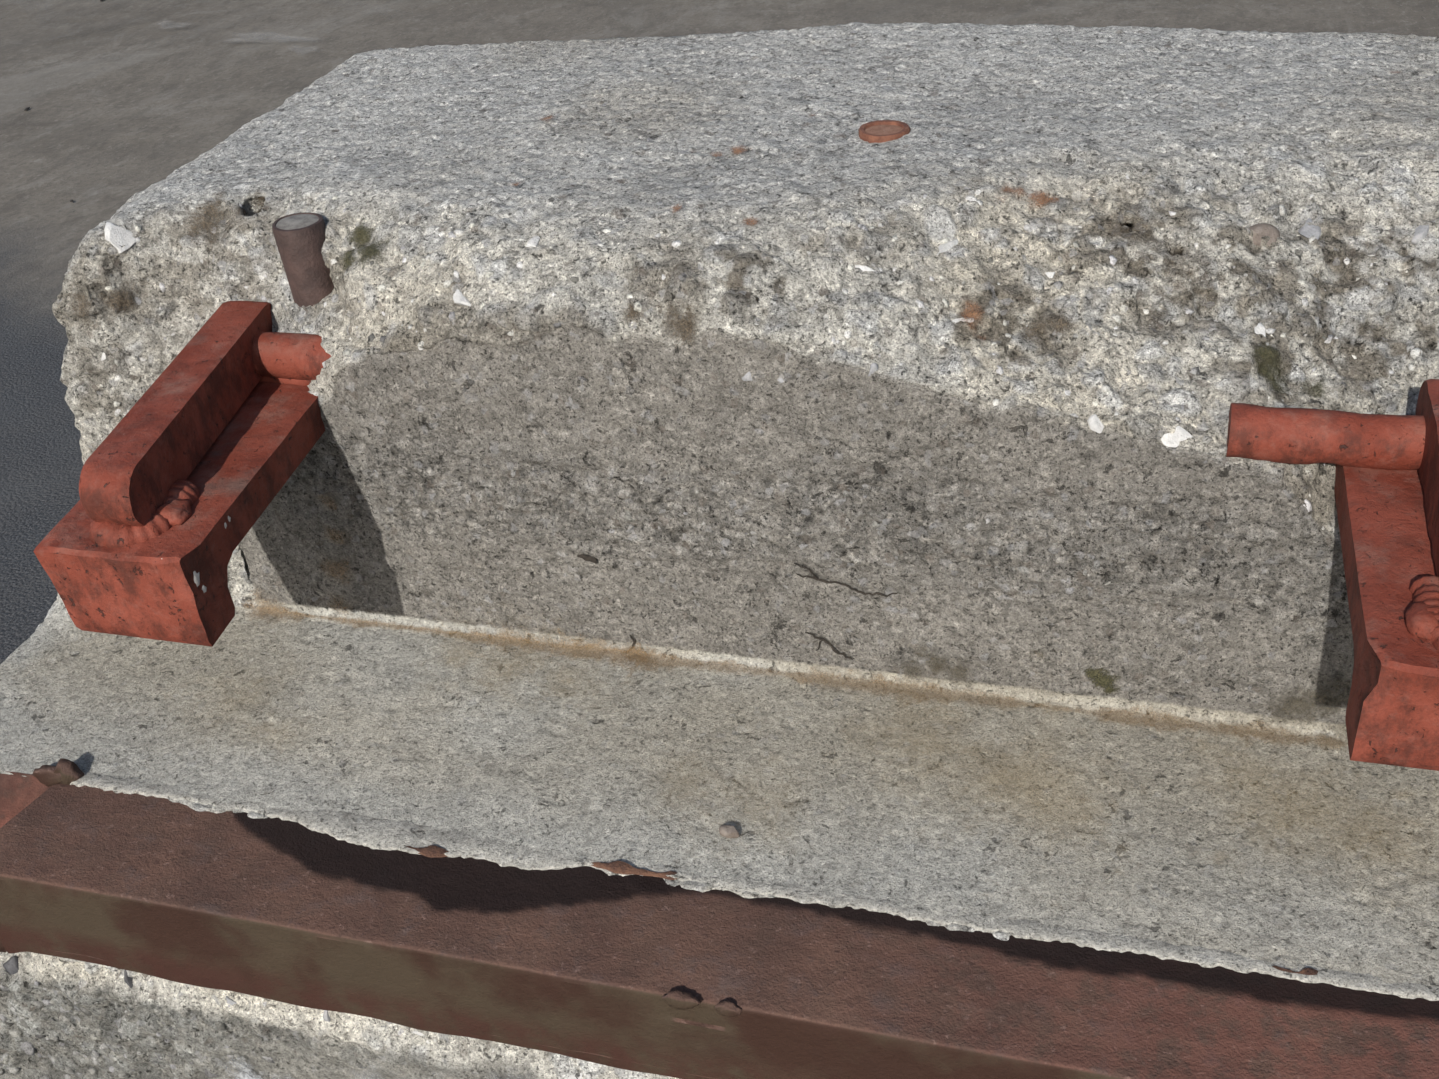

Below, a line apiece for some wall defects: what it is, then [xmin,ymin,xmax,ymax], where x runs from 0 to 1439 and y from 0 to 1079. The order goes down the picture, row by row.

corrosion [405,845,449,858]
corrosion [591,861,677,880]
corrosion [1272,966,1318,975]